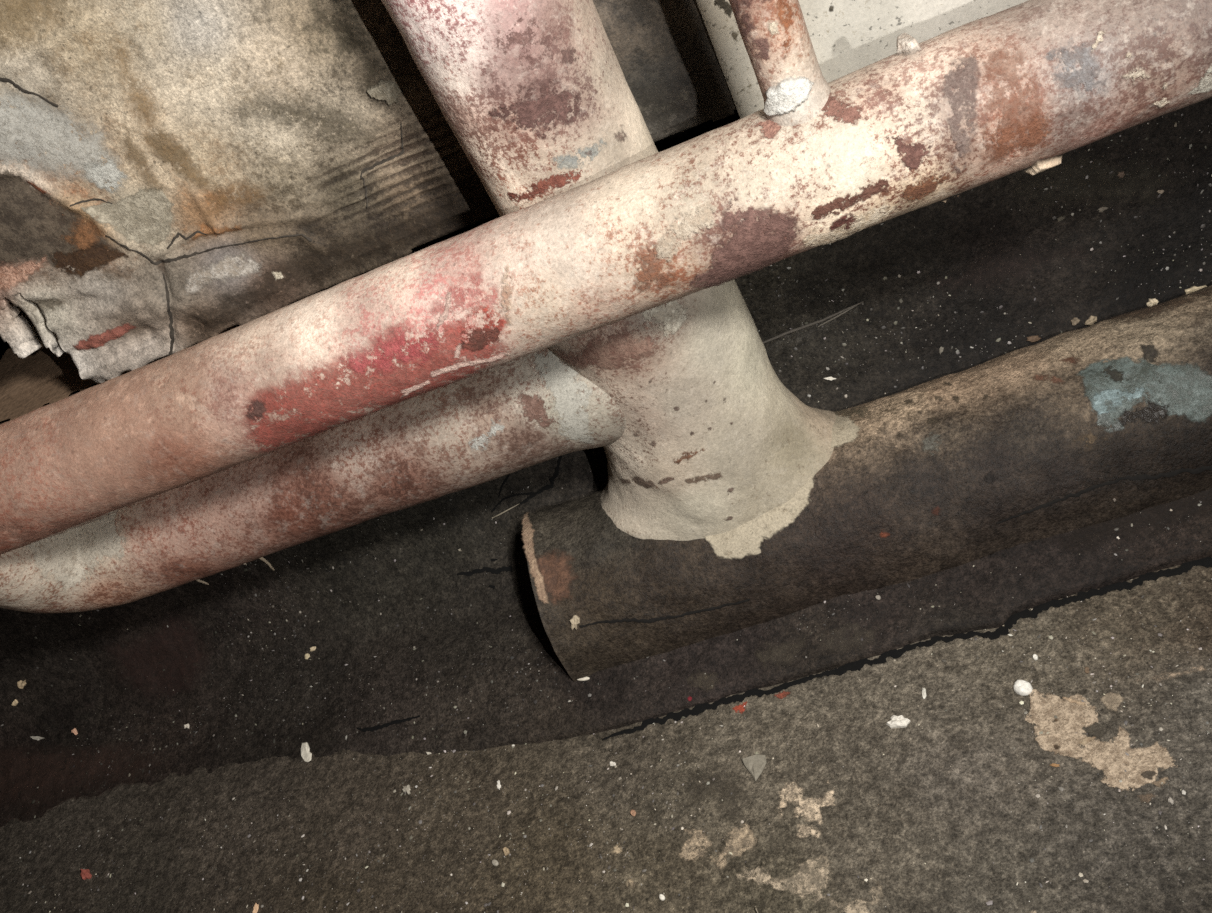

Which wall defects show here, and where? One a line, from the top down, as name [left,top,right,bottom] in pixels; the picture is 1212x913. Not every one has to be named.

rust [489,17,581,139]
crack [70,198,112,206]
rust [507,169,582,202]
rust [812,179,889,230]
rust [887,135,949,203]
rust [635,198,801,290]
crack [105,230,312,356]
rust [461,328,500,351]
spalling [1101,366,1129,383]
hole [1119,401,1169,425]
crack [579,557,1212,740]
peeling [1025,689,1178,803]